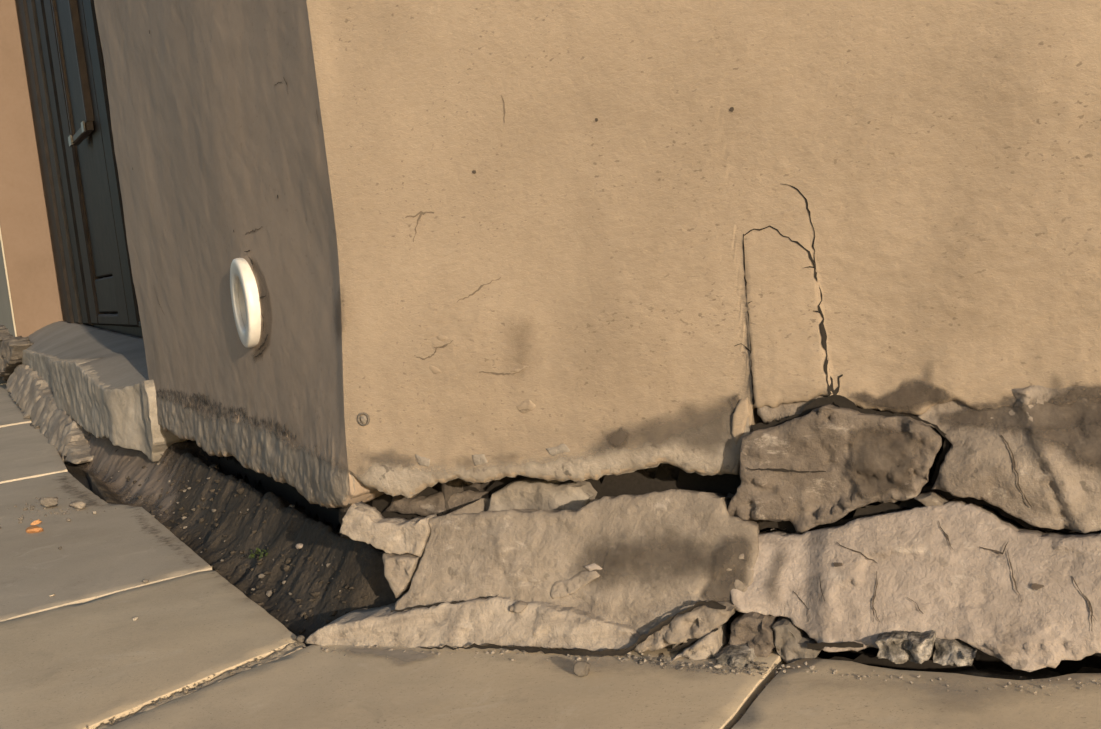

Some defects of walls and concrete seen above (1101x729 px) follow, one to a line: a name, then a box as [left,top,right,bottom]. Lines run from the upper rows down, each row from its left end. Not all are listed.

crack [190,440,341,530]
crack [372,475,520,520]
peeling [156,395,750,599]
leakage [605,395,739,447]
crack [584,464,826,499]
crack [735,184,1101,622]
leakage [855,380,1101,466]
spalling [914,385,1101,534]
spalling [509,601,528,613]
peeling [633,539,750,661]
crack [1072,577,1097,631]
crack [807,641,1101,680]